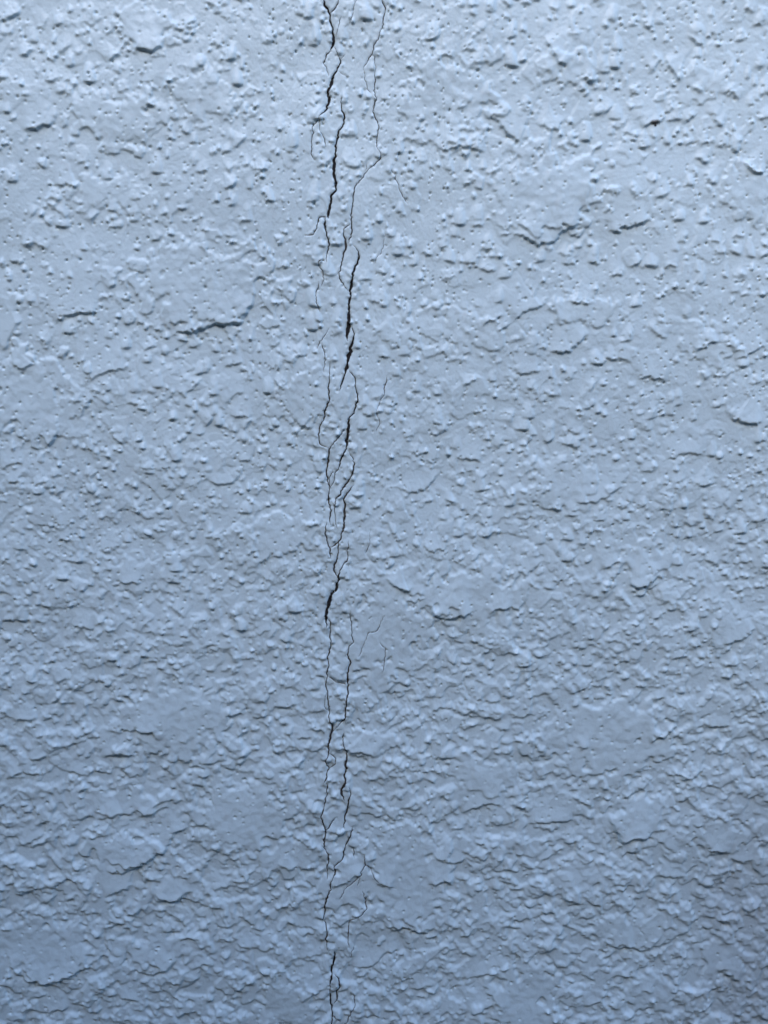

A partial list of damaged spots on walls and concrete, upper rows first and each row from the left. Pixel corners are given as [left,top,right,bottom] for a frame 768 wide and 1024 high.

crack [311,0,408,1024]